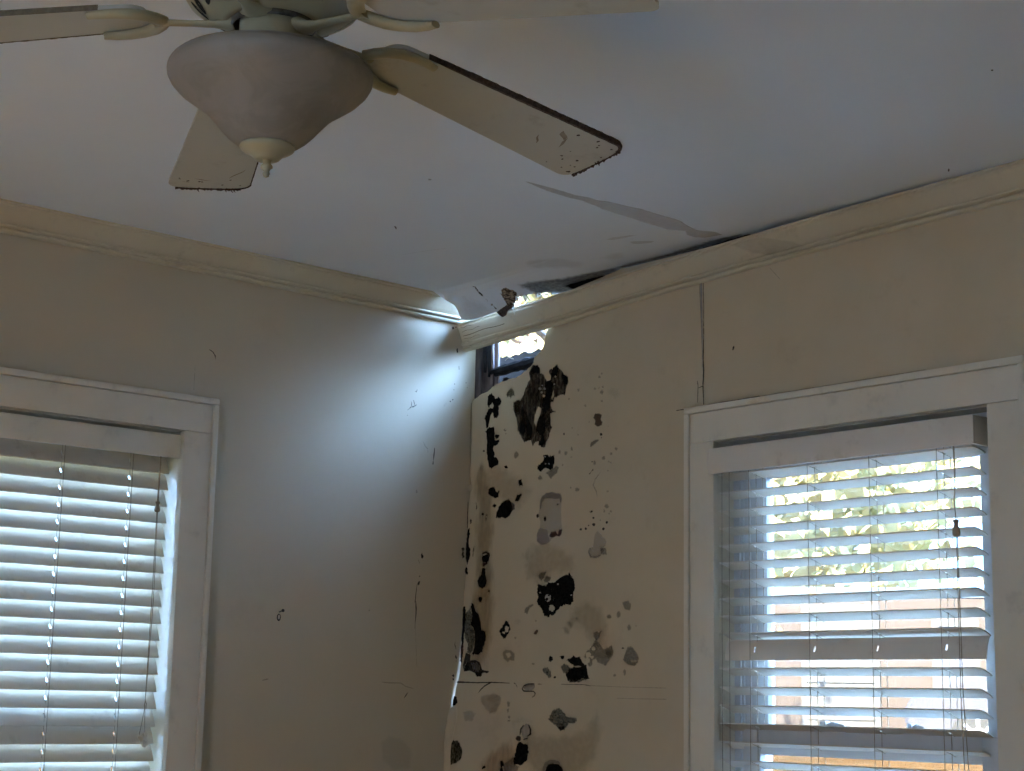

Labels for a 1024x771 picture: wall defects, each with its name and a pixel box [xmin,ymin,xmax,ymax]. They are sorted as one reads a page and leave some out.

crack [676,283,760,411]
mould [483,365,568,479]
mould [476,479,523,518]
mould [452,548,490,680]
mould [525,573,575,617]
mould [543,631,638,682]
mould [548,708,577,730]
mould [450,740,462,765]
mould [500,736,529,771]
water stain [545,763,563,771]